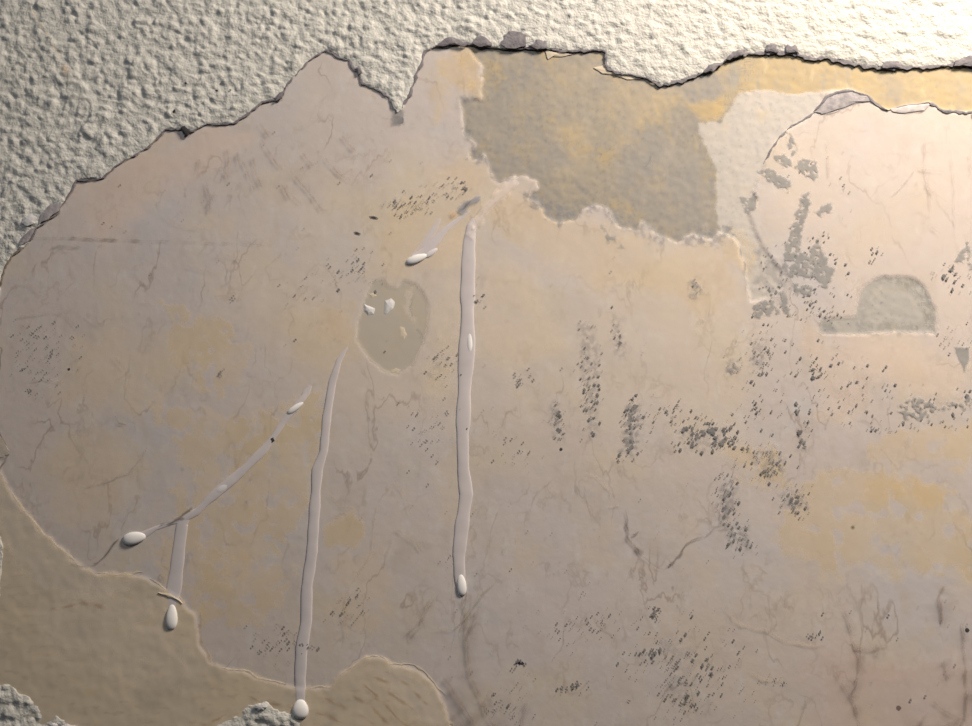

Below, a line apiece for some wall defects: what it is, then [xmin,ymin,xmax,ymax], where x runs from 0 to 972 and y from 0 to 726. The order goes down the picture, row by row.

flaking render [461,31,972,301]
flaking render [357,280,428,373]
damp [561,320,604,440]
damp [617,330,875,554]
peeling [0,476,296,726]
peeling [295,655,454,726]
damp [617,606,787,725]